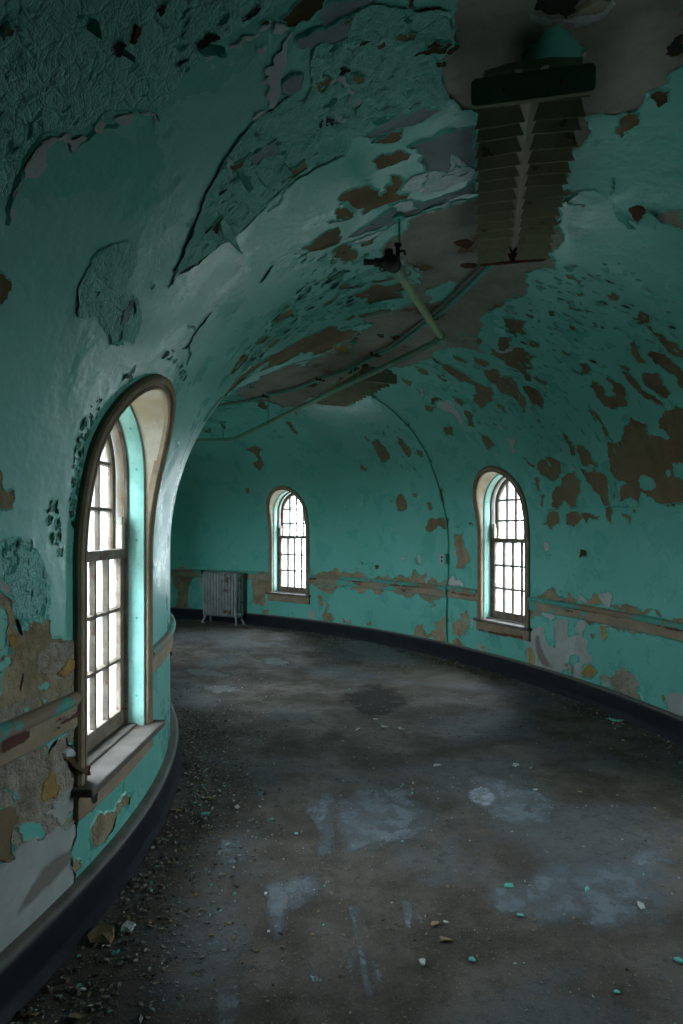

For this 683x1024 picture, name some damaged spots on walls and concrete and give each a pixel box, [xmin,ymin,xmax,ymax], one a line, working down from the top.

spalling [87,18,142,63]
peeling [10,112,159,224]
crack [76,110,344,346]
flaking render [196,0,683,552]
peeling [47,398,102,557]
flaking render [0,574,76,724]
flaking render [172,566,203,608]
flaking render [251,570,269,614]
peeling [308,487,489,652]
flaking render [525,610,683,701]
peeling [537,587,683,623]
flaking render [0,728,132,952]